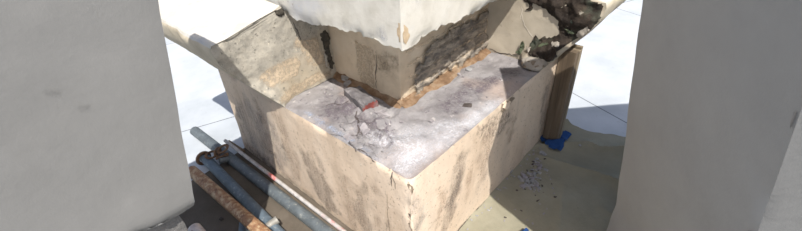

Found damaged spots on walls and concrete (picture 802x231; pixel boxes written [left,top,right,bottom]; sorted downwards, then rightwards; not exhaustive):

spalling [397,10,489,94]
peeling [515,0,603,72]
peeling [320,109,390,158]